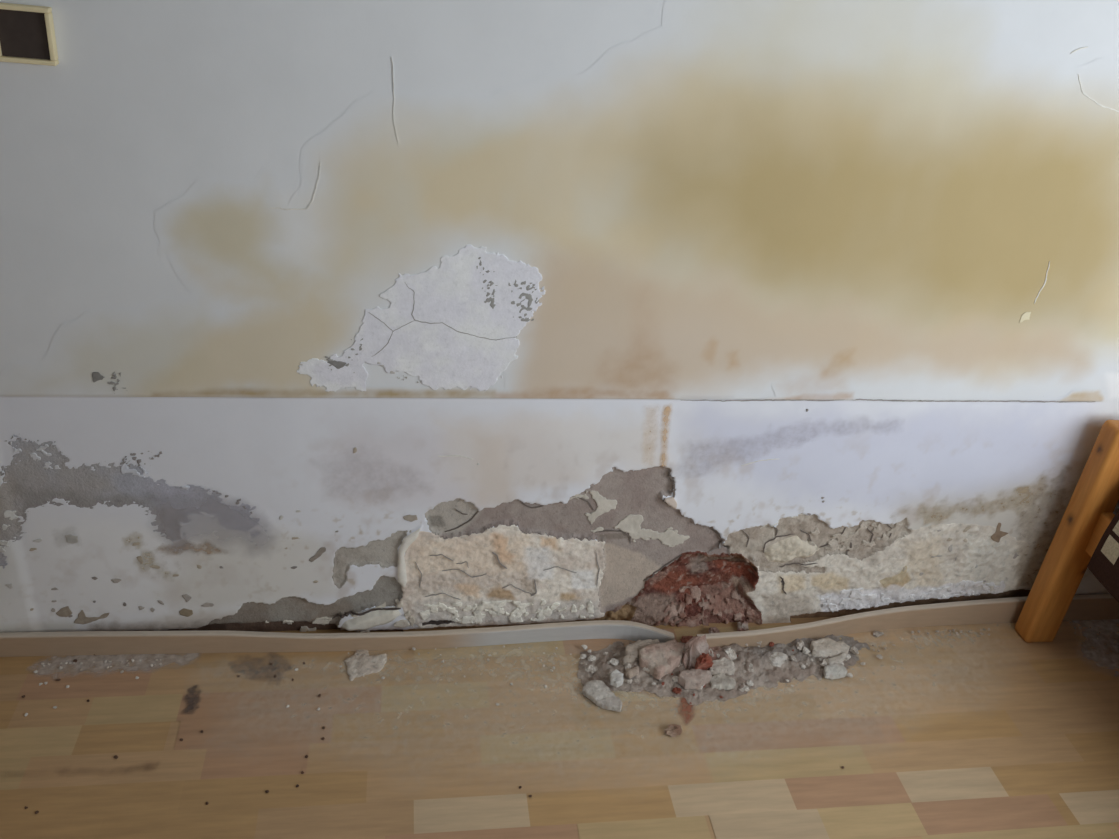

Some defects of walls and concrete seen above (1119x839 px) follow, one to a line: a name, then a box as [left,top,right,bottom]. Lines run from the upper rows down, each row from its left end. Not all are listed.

leakage [0,0,1119,400]
peeling [297,245,546,392]
crack [368,283,516,355]
peeling [51,588,109,624]
peeling [0,435,267,569]
spalling [179,466,912,690]
peeling [991,523,1008,542]